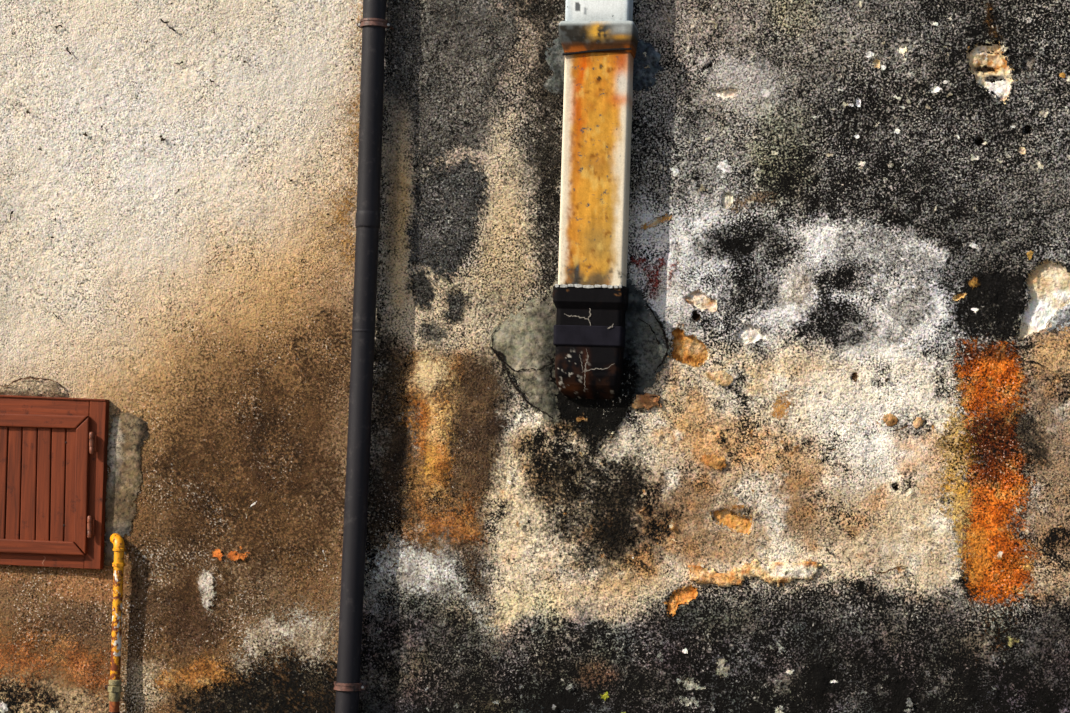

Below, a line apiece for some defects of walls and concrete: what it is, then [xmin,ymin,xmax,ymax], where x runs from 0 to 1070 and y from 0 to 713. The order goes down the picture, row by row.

flaking render [966,2,1038,104]
damp [384,0,528,346]
damp [826,221,942,335]
flaking render [952,277,981,301]
flaking render [1017,250,1070,342]
damp [141,302,353,713]
corrosion [397,348,487,547]
damp [522,356,652,576]
flaking render [710,508,773,535]
corrosion [930,339,1051,648]
flaking render [664,553,822,616]
corrosion [0,623,123,703]